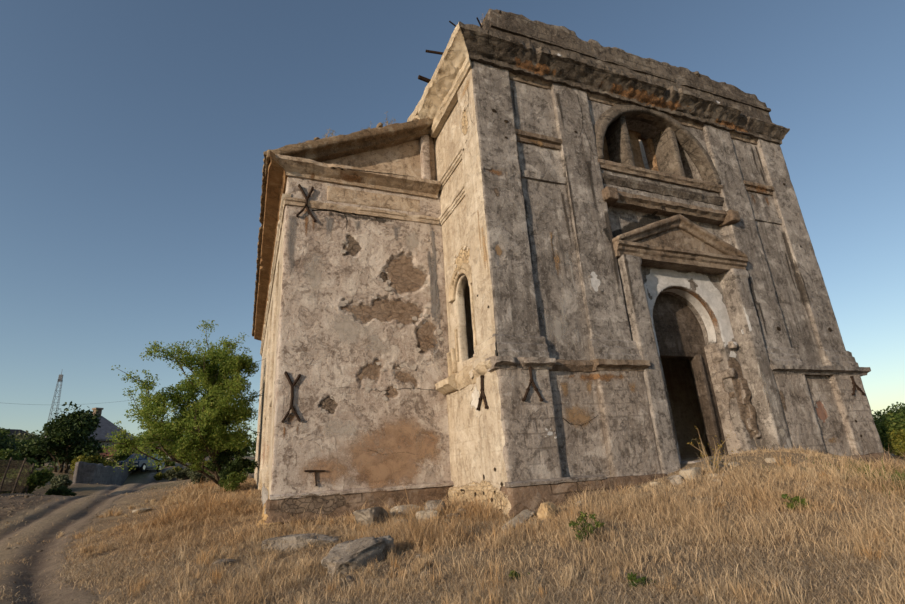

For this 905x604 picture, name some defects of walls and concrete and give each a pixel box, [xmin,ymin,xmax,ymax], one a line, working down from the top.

crack [312,209,382,229]
peeling [589,272,603,292]
spalling [339,255,444,353]
peeling [644,268,759,444]
spalling [357,359,422,401]
spalling [319,397,338,414]